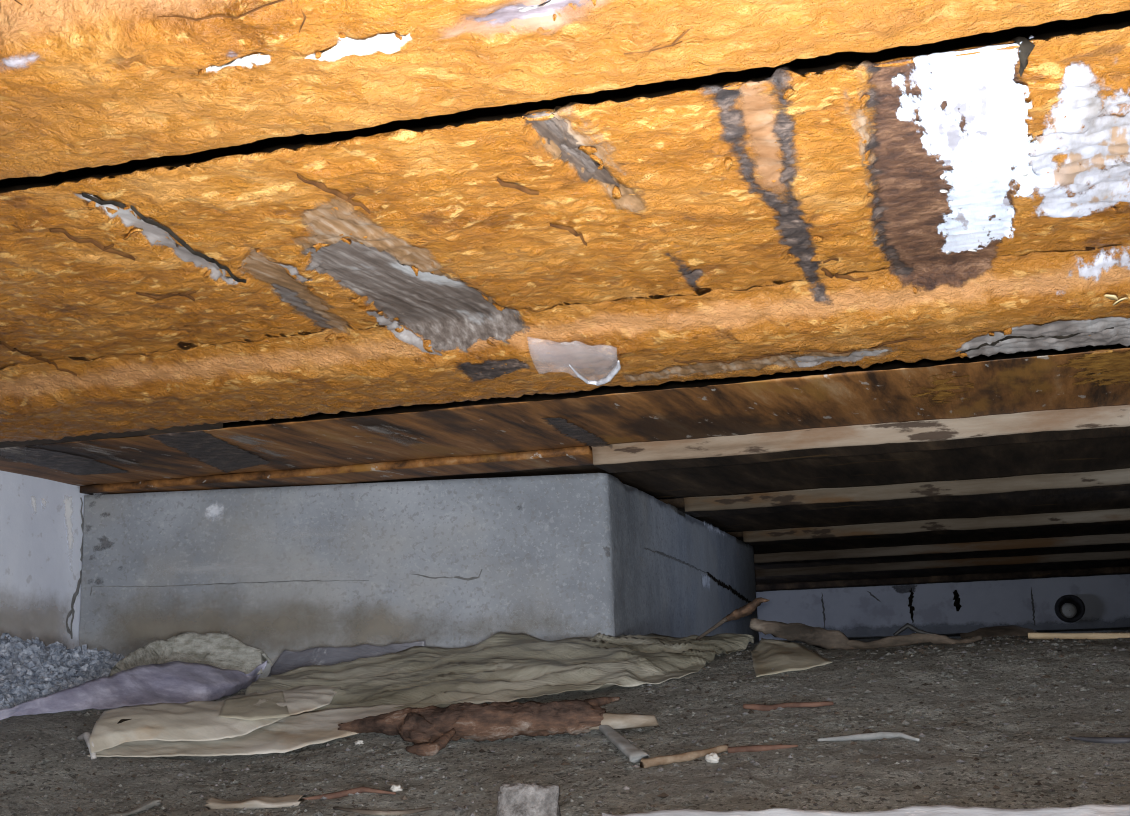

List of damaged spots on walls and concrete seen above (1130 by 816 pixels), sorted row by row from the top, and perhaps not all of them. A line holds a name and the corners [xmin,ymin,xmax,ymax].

peeling [198,53,270,75]
peeling [304,32,411,61]
crack [624,26,693,54]
peeling [525,105,645,212]
leakage [703,67,829,304]
peeling [892,37,1130,254]
peeling [75,193,530,381]
peeling [1069,247,1130,281]
peeling [956,294,1130,358]
peeling [534,336,926,386]
crack [66,498,369,639]
crack [644,548,751,603]